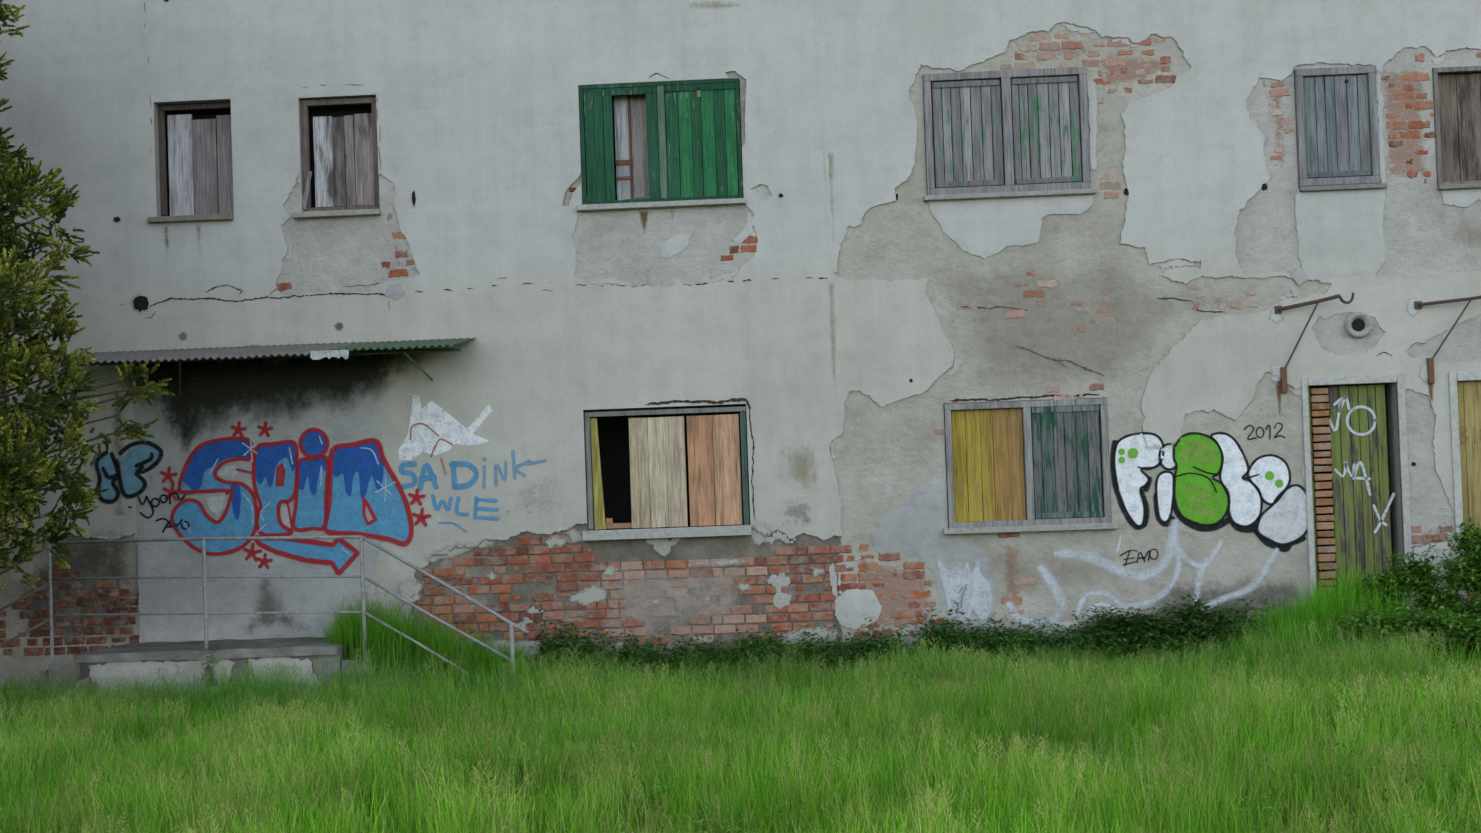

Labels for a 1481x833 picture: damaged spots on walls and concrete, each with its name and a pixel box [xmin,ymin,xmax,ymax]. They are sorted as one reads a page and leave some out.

peeling [276,173,420,296]
crack [121,277,648,334]
peeling [398,22,1481,665]
spalling [0,534,321,706]